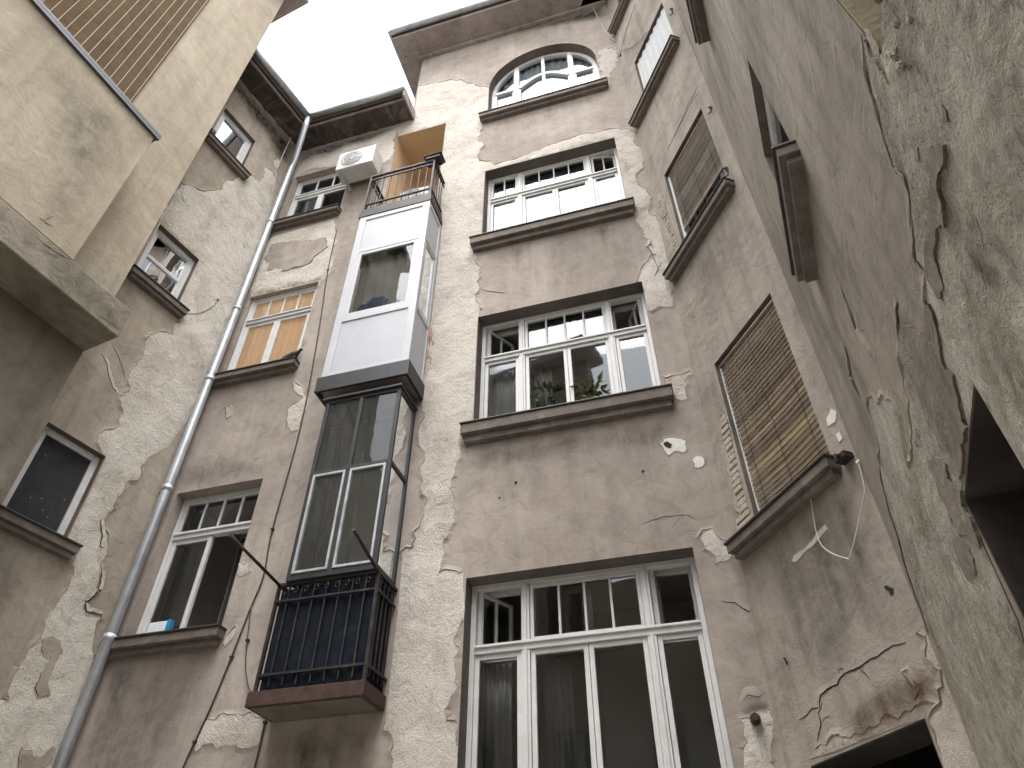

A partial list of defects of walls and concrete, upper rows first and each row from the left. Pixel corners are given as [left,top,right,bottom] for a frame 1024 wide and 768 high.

peeling [0,157,340,768]
peeling [292,78,680,768]
peeling [661,367,694,403]
peeling [658,435,707,470]
flaking render [694,413,753,567]
peeling [733,705,780,768]
crack [797,467,928,742]
peeling [809,0,1024,768]